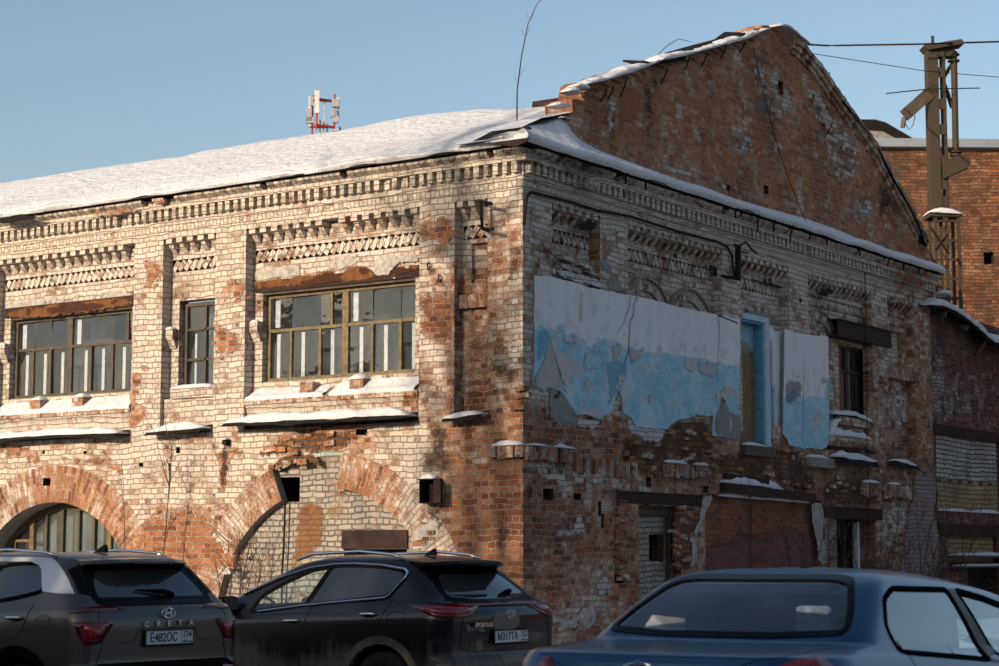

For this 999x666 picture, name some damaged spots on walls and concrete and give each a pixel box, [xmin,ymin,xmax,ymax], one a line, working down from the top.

peeling [143,259,164,290]
corrosion [254,266,378,289]
corrosion [391,265,418,276]
flaking render [6,285,133,308]
corrosion [7,298,132,318]
peeling [211,264,300,360]
spalling [511,329,644,428]
spalling [623,386,812,493]
spalling [543,488,553,500]
spalling [823,475,916,507]
spalling [553,606,596,630]